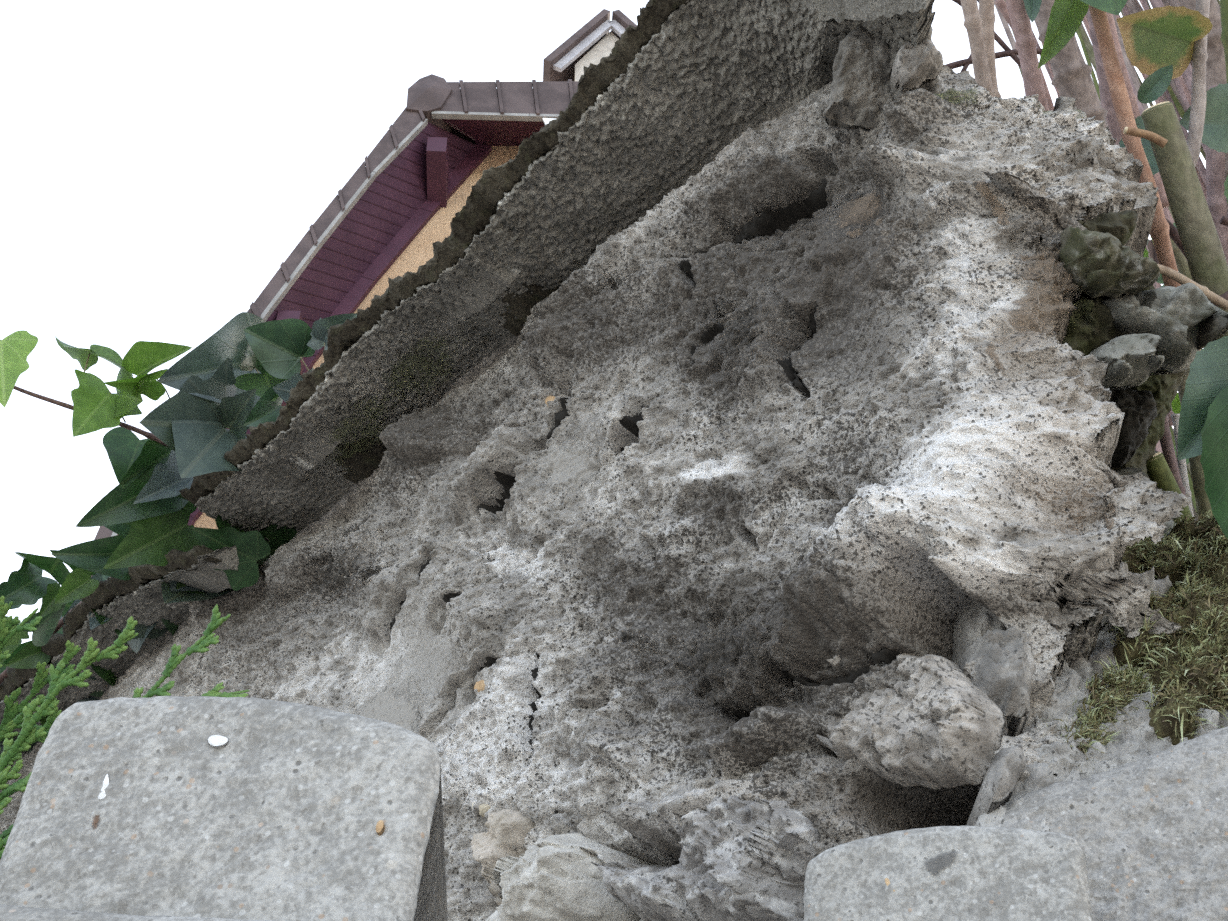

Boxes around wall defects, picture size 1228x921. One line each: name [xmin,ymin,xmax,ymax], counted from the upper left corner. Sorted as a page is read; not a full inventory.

spalling [840,193,886,238]
spalling [1013,247,1078,334]
spalling [985,346,1005,375]
spalling [1034,483,1116,536]
crack [478,656,497,672]
crack [528,652,542,765]